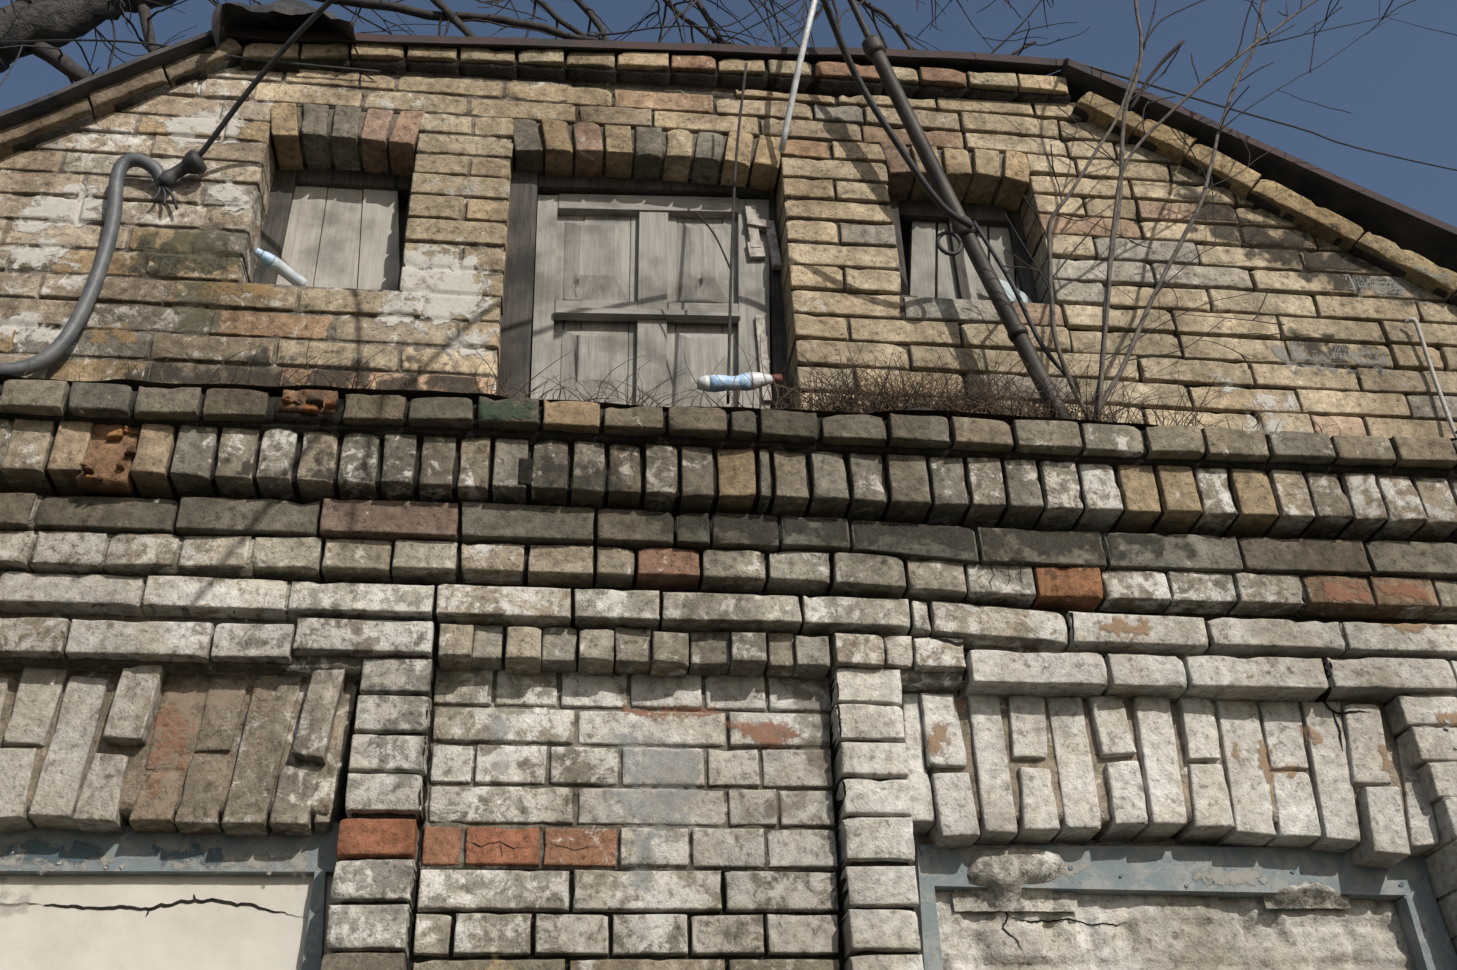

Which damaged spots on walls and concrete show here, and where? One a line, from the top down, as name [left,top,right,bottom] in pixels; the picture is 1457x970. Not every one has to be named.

spalling [76,424,140,498]
crack [1316,660,1366,751]
crack [0,894,307,918]
crack [1002,911,1139,953]